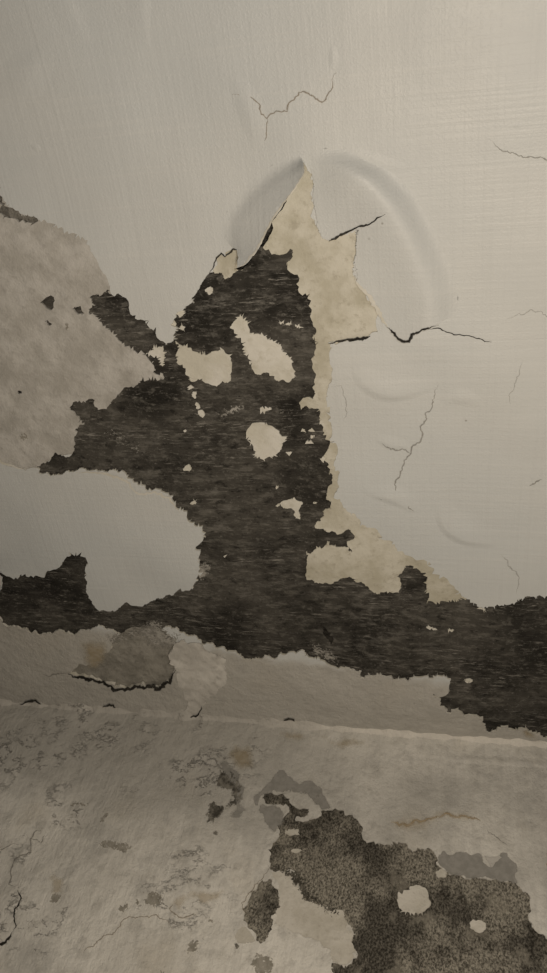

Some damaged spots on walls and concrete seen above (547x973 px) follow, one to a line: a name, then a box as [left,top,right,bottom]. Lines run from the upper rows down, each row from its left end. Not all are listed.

crack [238,73,336,141]
crack [433,328,488,342]
spalling [0,148,547,737]
crack [383,389,436,508]
crack [0,830,45,946]
peeling [250,953,273,973]
peeling [271,871,355,965]